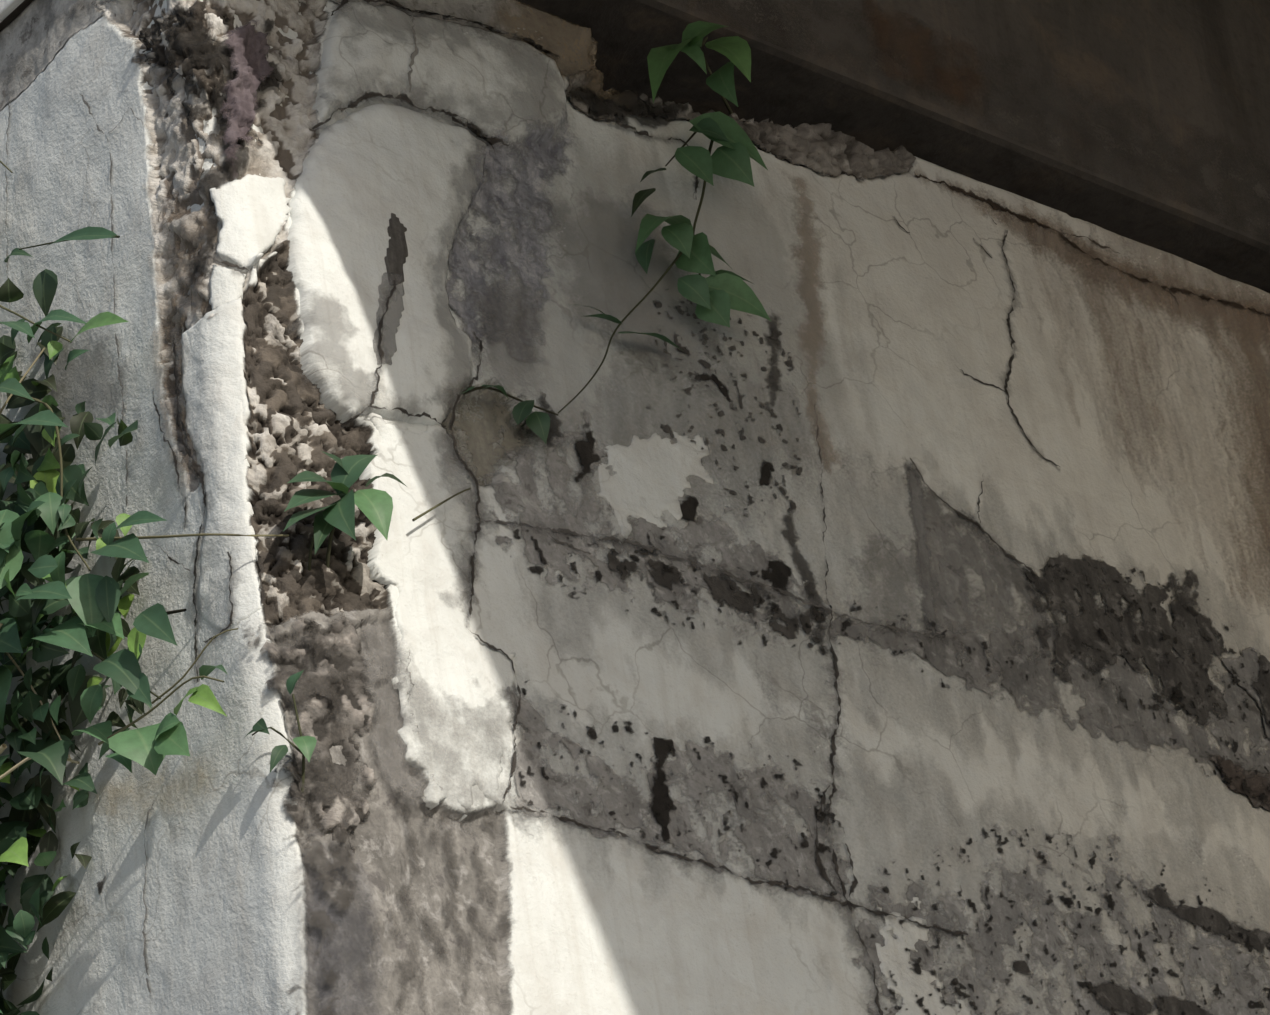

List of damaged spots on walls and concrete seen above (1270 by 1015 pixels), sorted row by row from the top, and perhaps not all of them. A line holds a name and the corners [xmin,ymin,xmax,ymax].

spalling [729,113,916,180]
crack [80,94,266,682]
spalling [95,0,850,1015]
damp [562,705,648,769]
crack [341,279,969,1015]
damp [651,299,862,655]
peeling [483,393,1270,811]
crack [910,458,1049,596]
crack [914,175,1270,467]
damp [885,937,1001,1015]
damp [957,875,1153,985]
spalling [853,834,1270,1015]